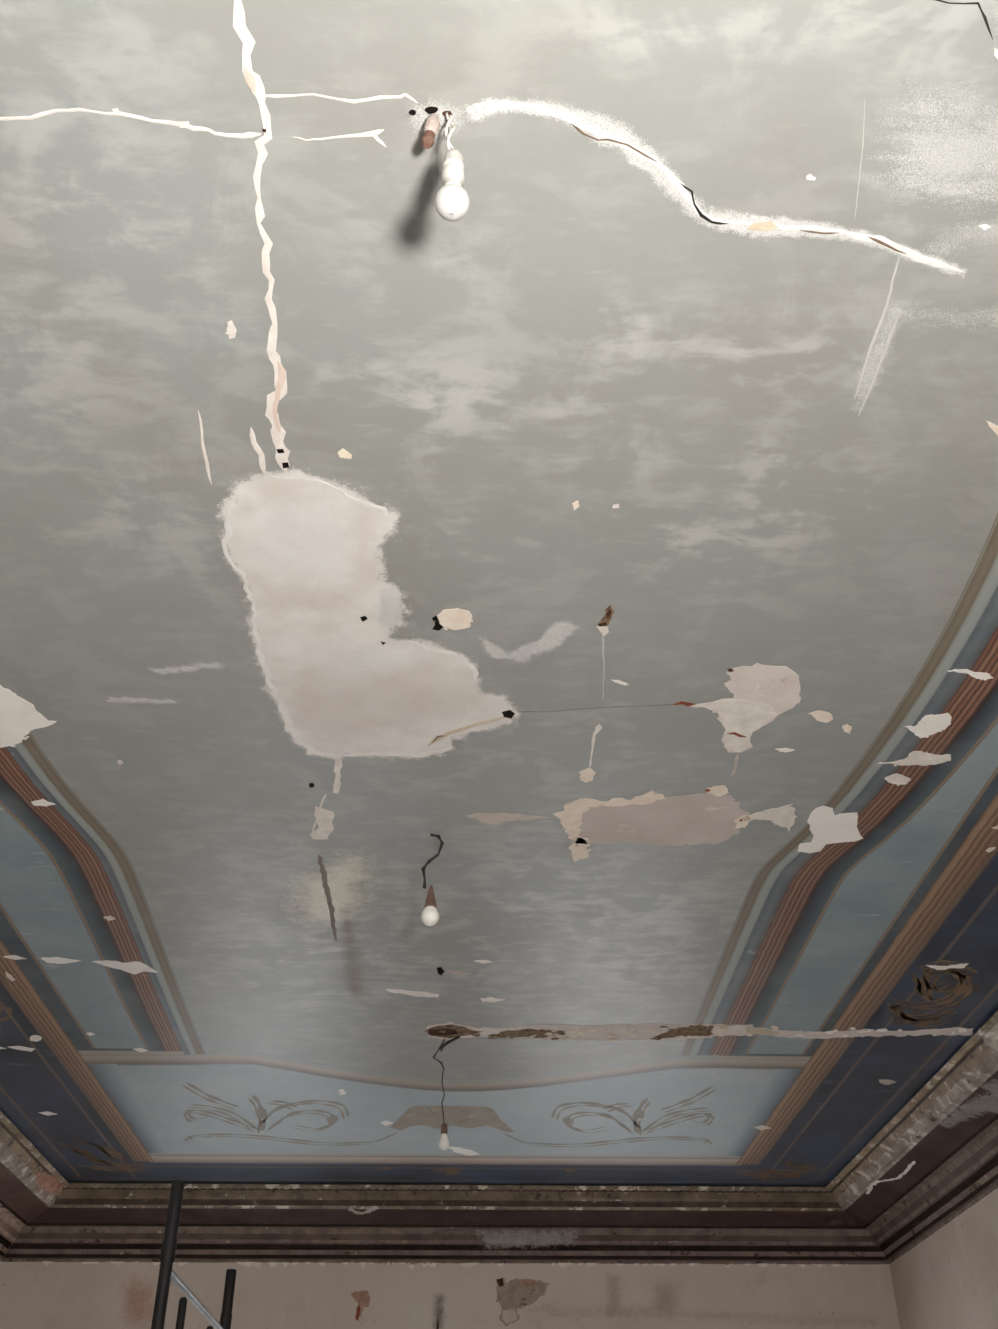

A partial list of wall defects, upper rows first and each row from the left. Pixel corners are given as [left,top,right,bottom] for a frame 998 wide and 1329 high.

crack [936,0,998,59]
crack [465,96,968,279]
crack [0,0,417,473]
flaking render [432,608,473,631]
flaking render [0,685,57,748]
flaking render [878,713,952,786]
peeling [466,813,550,825]
flaking render [736,801,863,853]
crack [425,1017,998,1052]
flaking render [342,1229,700,1327]